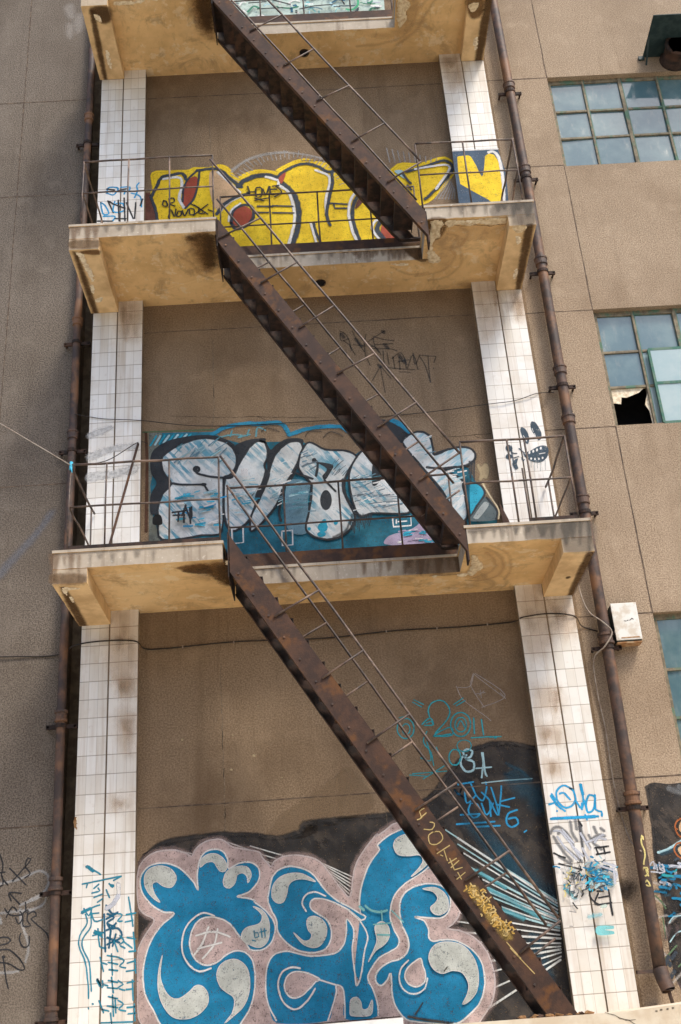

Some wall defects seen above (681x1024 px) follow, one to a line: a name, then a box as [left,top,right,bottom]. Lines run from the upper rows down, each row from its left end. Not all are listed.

flaking render [427,217,533,290]